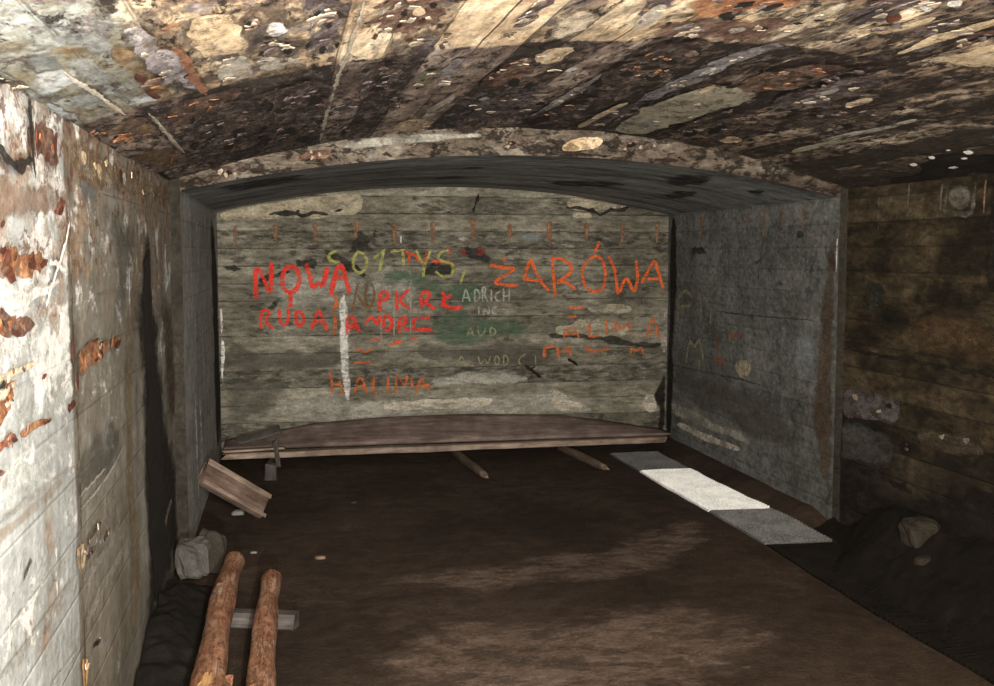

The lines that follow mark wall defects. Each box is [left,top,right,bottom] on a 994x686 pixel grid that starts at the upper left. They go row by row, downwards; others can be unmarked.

spalling [167,0,451,161]
peeling [393,0,994,153]
spalling [89,117,157,143]
crack [0,144,34,175]
spalling [0,246,48,284]
spalling [0,308,35,338]
spalling [78,336,121,376]
spalling [0,362,52,452]
leakage [80,221,177,628]